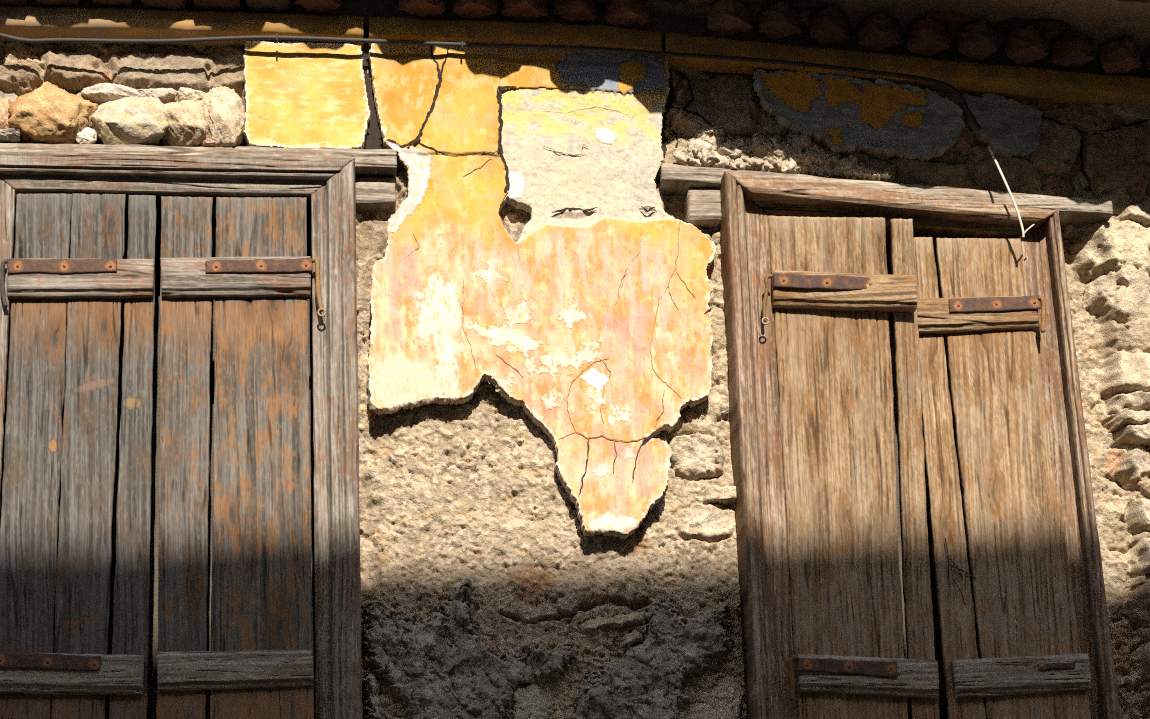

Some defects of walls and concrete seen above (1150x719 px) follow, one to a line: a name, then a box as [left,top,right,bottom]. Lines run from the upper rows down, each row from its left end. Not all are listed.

crack [362,24,516,193]
crack [661,40,714,155]
peeling [752,69,1043,161]
crack [552,206,597,214]
peeling [244,41,717,539]
crack [462,278,523,377]
crack [560,206,713,497]